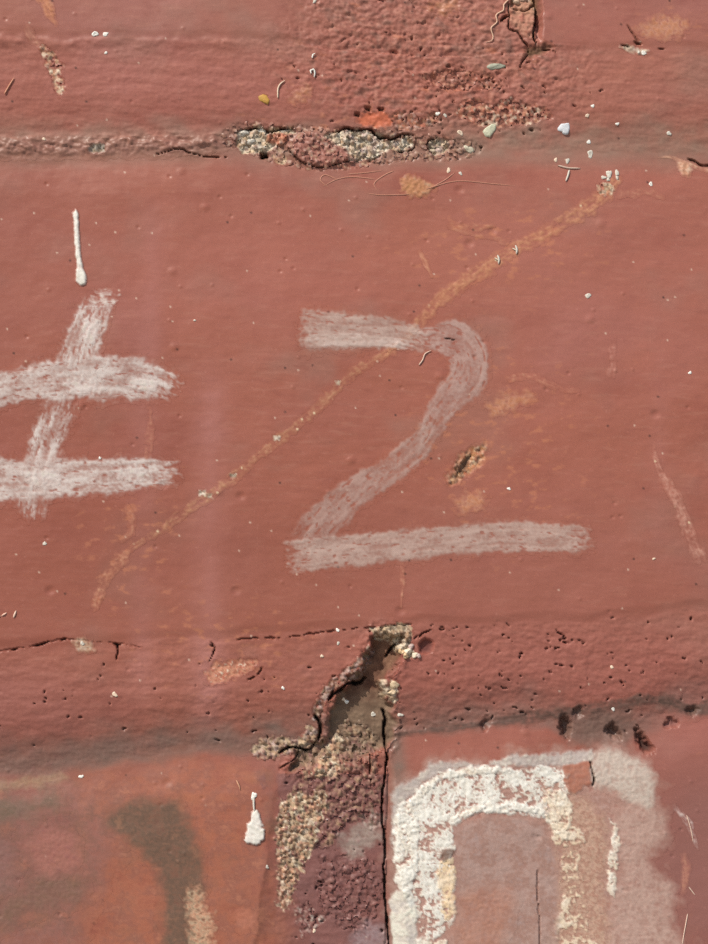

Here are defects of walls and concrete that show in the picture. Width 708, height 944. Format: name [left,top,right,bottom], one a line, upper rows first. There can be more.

crack [499,0,557,70]
peeling [220,63,570,173]
crack [278,744,301,771]
spalling [248,621,421,934]
crack [369,707,389,837]
peeling [562,759,596,795]
peeling [438,846,456,863]